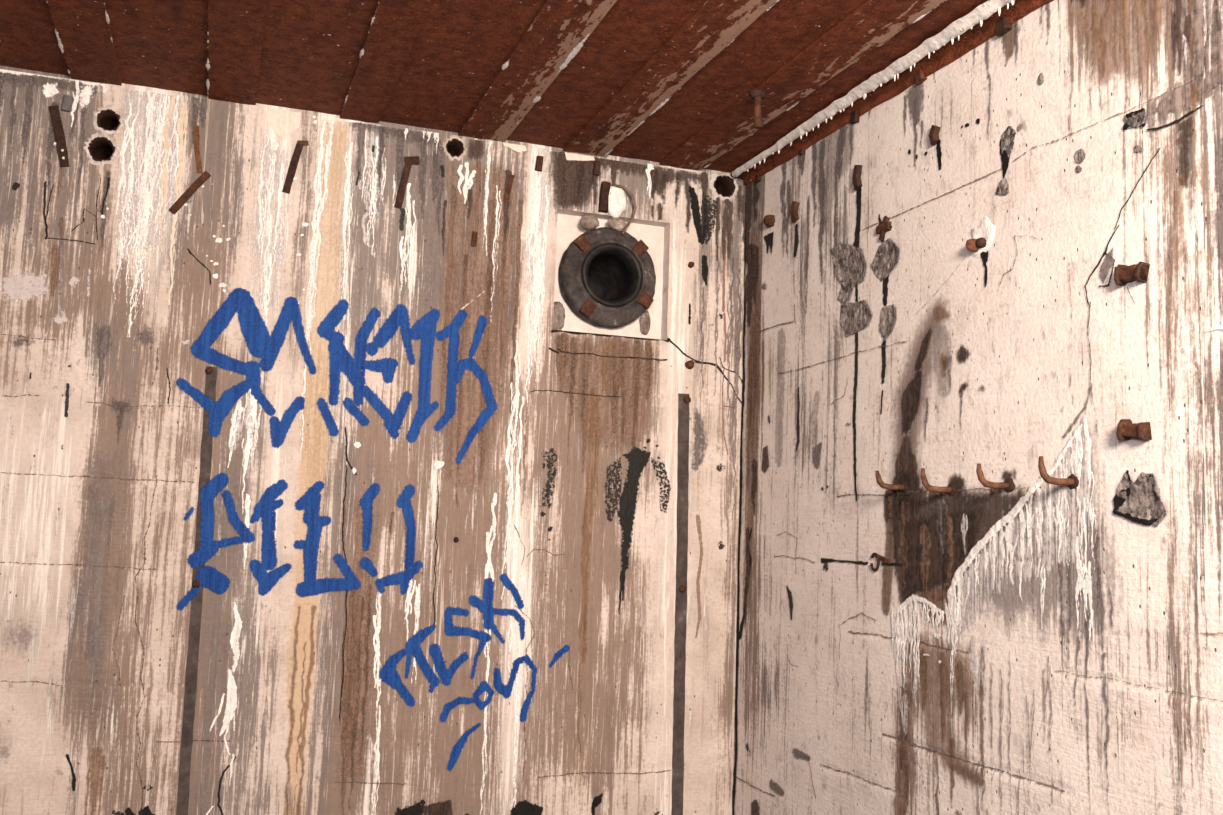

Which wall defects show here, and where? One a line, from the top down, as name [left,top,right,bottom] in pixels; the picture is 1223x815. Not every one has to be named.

crack [0,472,237,815]
water stain [112,398,130,434]
water stain [285,606,316,815]
water stain [299,0,1015,815]
spalling [830,238,898,341]
water stain [891,406,1115,815]
crack [1063,148,1160,438]
spalling [1113,470,1167,527]
water stain [1147,0,1223,487]
water stain [1169,509,1204,800]